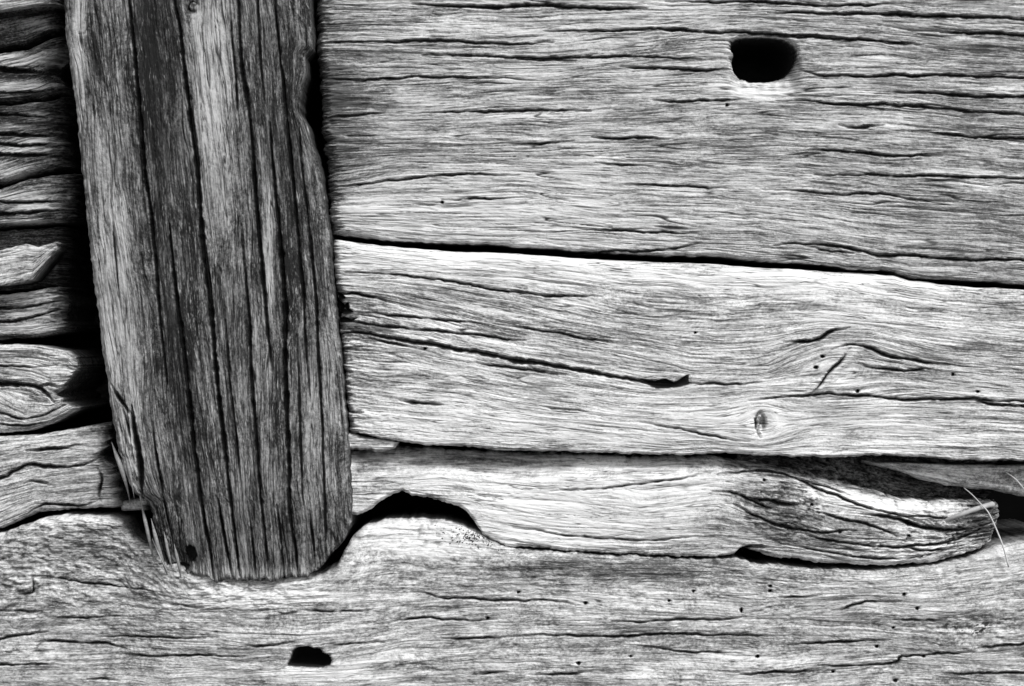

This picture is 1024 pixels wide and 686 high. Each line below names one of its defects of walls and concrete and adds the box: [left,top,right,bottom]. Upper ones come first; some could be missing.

crack [128,0,326,570]
crack [342,272,1024,407]
crack [570,470,981,560]